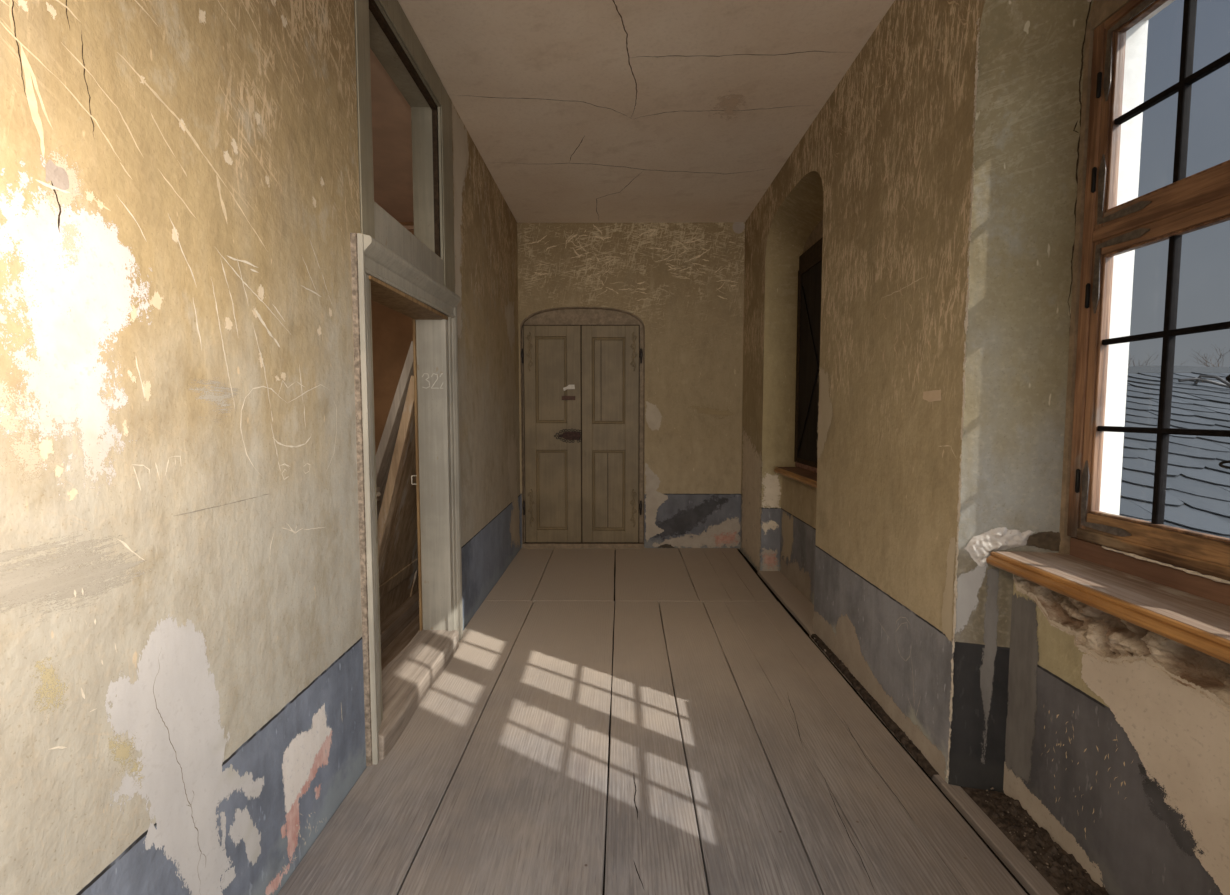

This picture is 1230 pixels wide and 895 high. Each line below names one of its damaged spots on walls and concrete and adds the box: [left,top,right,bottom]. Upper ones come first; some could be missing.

crack [12,0,28,102]
crack [66,0,94,137]
crack [458,0,687,119]
crack [51,181,61,233]
spalling [45,159,69,191]
peeling [129,290,164,322]
peeling [127,370,151,402]
leakage [653,516,741,548]
spalling [1013,574,1230,712]
crack [153,652,206,895]
peeling [1003,761,1107,891]
peeling [221,866,236,889]